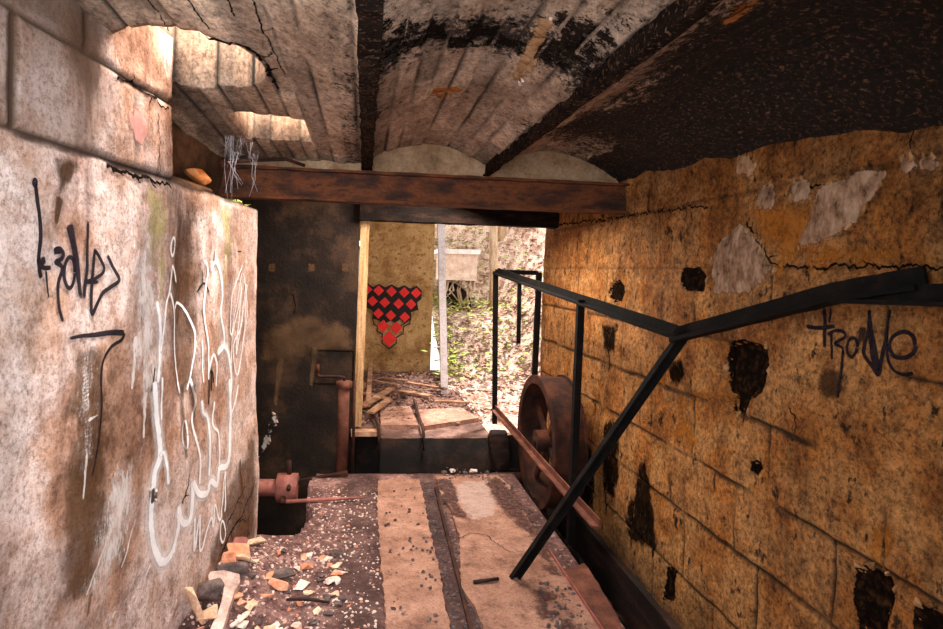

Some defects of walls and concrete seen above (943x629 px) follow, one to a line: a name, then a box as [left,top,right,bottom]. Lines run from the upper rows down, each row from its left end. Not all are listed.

crack [559,205,709,226]
flaking render [736,155,776,209]
flaking render [787,166,887,250]
crack [746,223,943,271]
flaking render [899,143,943,174]
leakage [265,318,349,405]
leakage [582,443,620,511]
leakage [624,462,656,557]